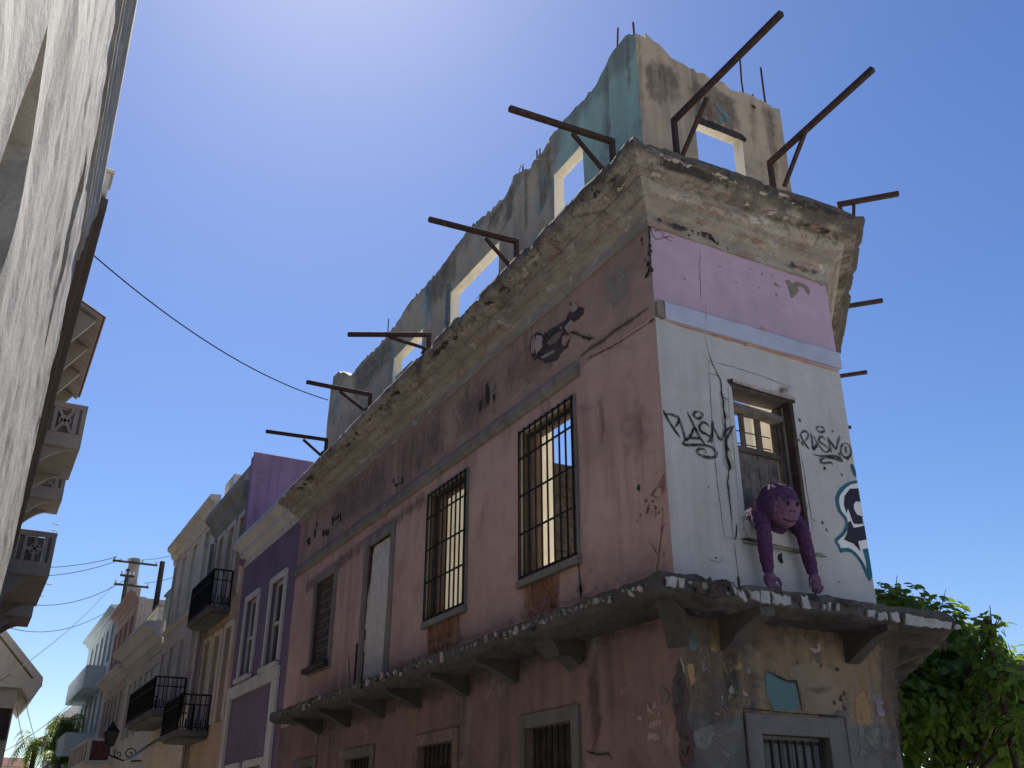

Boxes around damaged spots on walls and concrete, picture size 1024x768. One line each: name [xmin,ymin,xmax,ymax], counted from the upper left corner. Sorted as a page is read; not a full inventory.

peeling [651,171,830,250]
peeling [433,230,570,357]
spalling [641,226,673,278]
peeling [740,235,822,298]
flaking render [530,304,584,364]
crack [704,333,794,569]
spalling [272,583,647,716]
spalling [634,618,720,768]
flaking render [766,660,890,727]